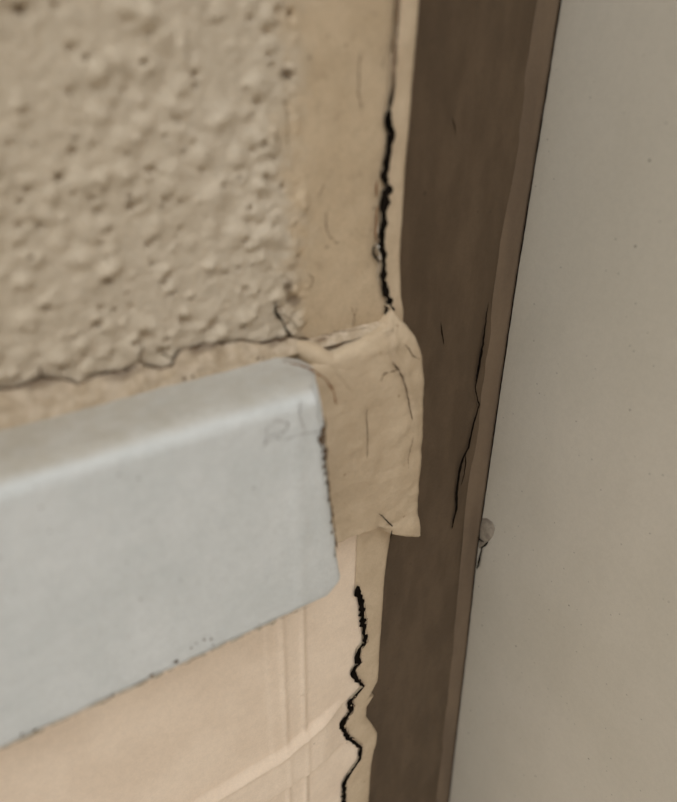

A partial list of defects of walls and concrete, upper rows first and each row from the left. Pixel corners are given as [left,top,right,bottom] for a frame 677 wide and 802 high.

crack [372,78,395,315]
crack [0,304,364,390]
crack [264,361,337,547]
crack [381,344,419,468]
crack [339,586,368,802]